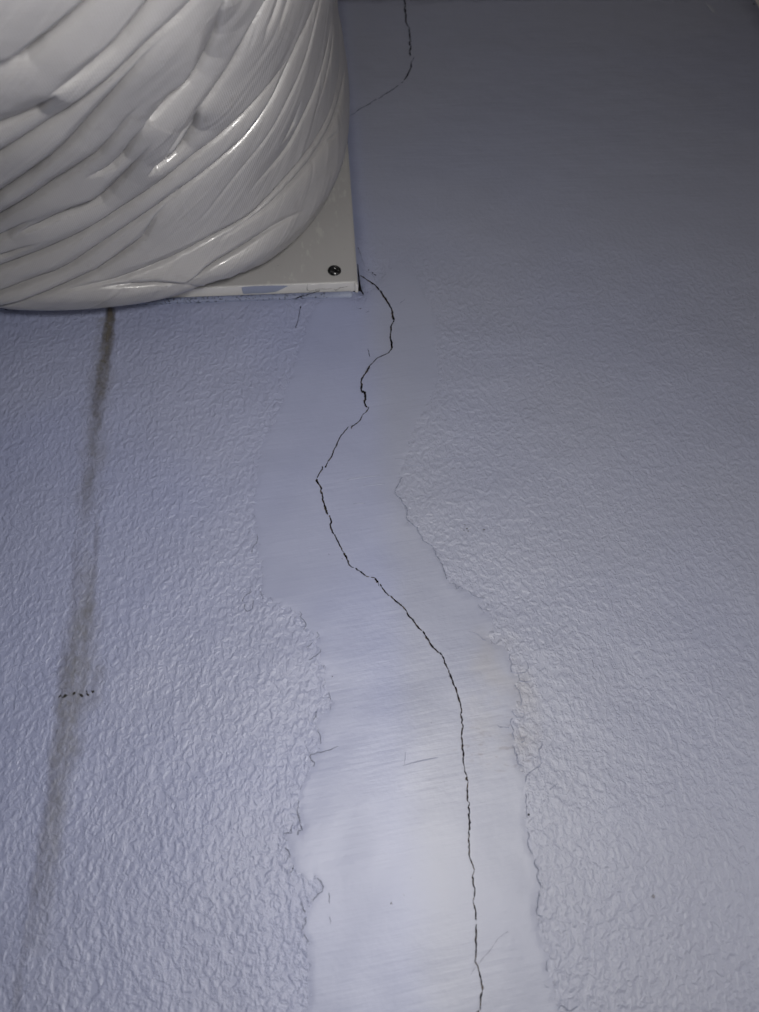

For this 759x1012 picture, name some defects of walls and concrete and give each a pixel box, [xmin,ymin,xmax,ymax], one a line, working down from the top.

damp [98,307,115,384]
crack [295,275,507,1012]